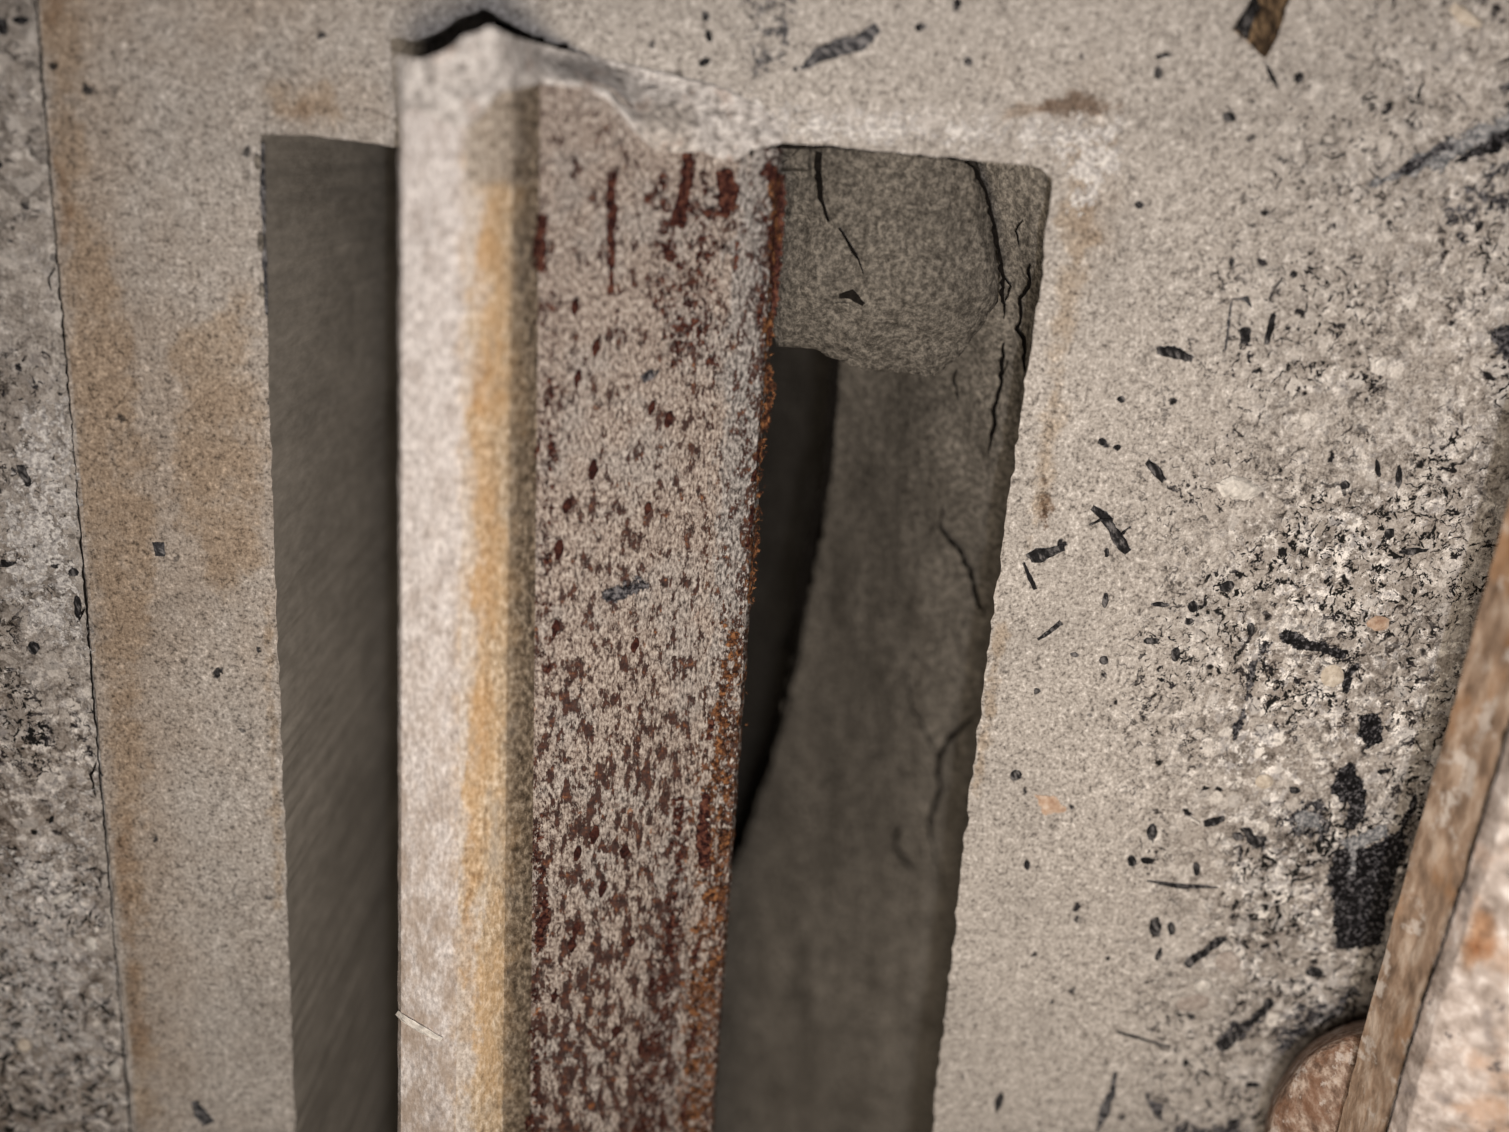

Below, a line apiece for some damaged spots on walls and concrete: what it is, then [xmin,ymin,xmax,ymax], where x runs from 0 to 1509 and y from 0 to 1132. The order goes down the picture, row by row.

corrosion [531,214,548,273]
corrosion [533,287,564,686]
corrosion [596,152,740,376]
corrosion [743,161,788,604]
crack [938,504,984,616]
crack [953,159,1031,456]
corrosion [524,804,551,1132]
corrosion [629,619,748,1132]
crack [893,677,973,890]